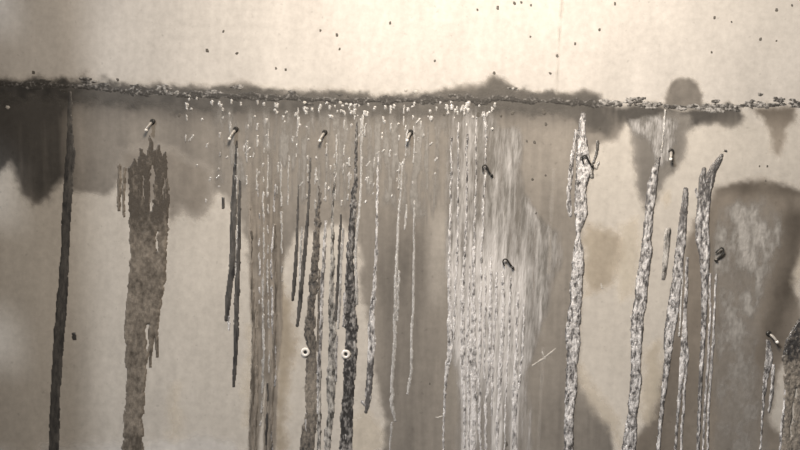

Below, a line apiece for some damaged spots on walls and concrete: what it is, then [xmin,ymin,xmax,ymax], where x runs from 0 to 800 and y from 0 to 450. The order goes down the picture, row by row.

water stain [0,75,745,450]
water stain [621,131,800,450]
water stain [754,105,797,156]